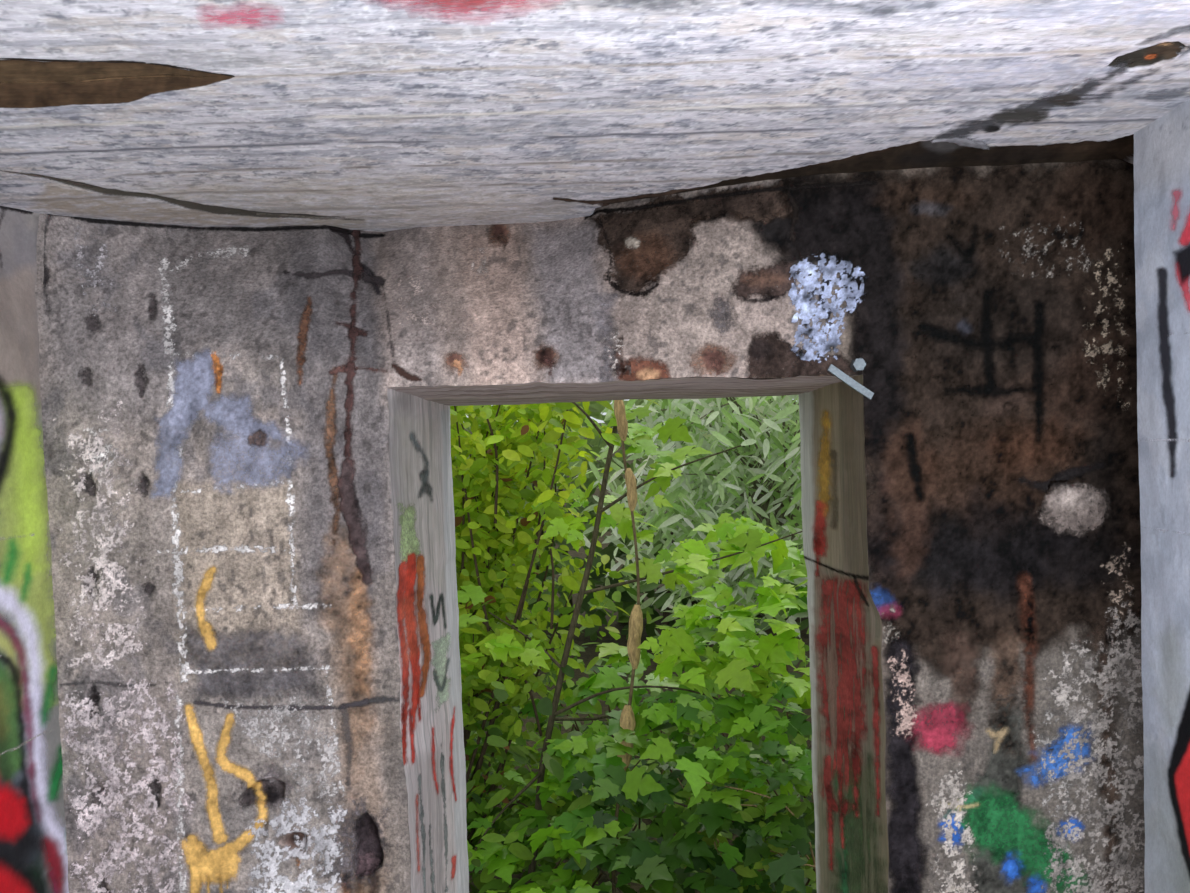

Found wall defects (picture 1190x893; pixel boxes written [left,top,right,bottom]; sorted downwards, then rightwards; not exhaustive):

spalling [0,58,235,108]
crack [0,171,422,381]
corrosion [211,353,223,393]
corrosion [296,297,312,385]
corrosion [324,230,387,716]
spalling [553,134,1134,389]
water stain [691,159,1142,893]
peeling [222,696,391,893]